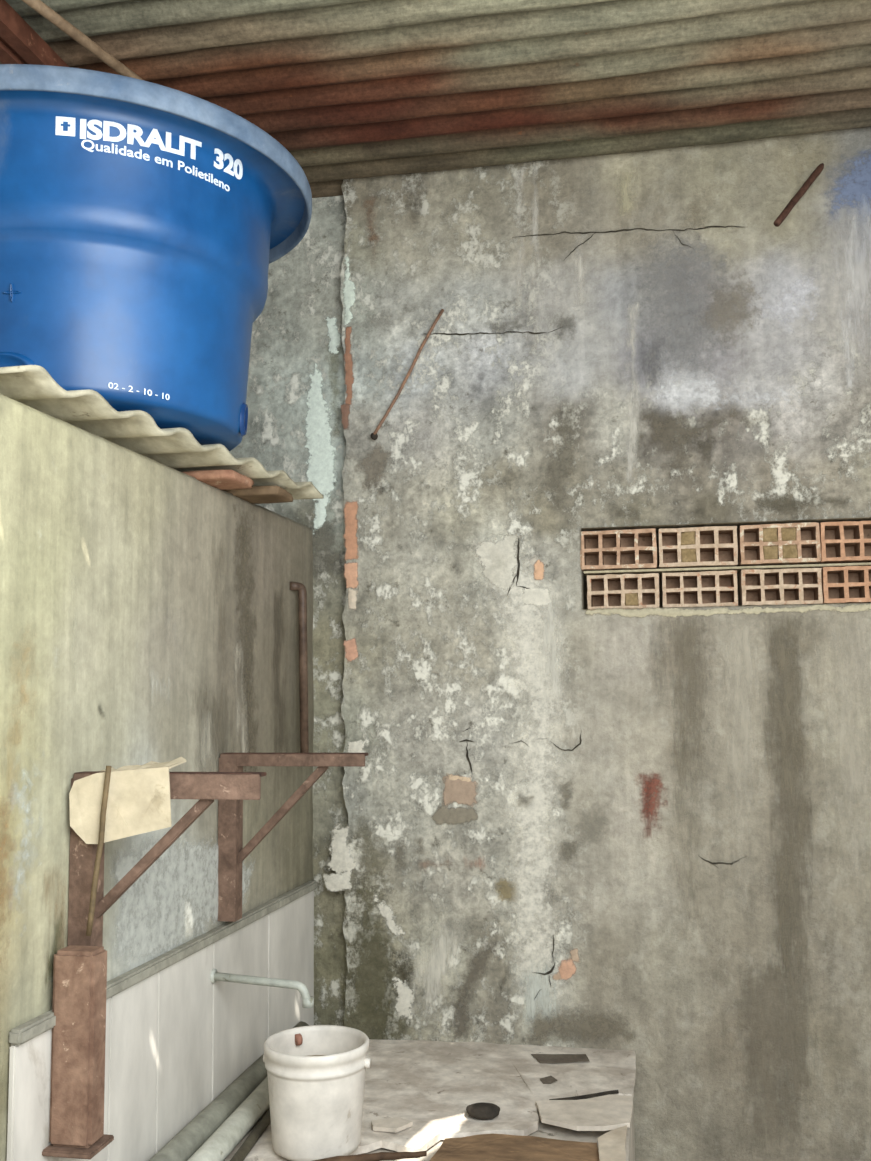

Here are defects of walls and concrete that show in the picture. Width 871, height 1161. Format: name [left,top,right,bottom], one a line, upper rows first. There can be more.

crack [512,226,740,260]
crack [426,326,563,335]
water stain [628,247,753,477]
peeling [304,256,356,534]
water stain [759,497,846,511]
spalling [344,502,358,610]
spalling [343,638,358,661]
spalling [432,774,478,825]
water stain [769,621,809,976]